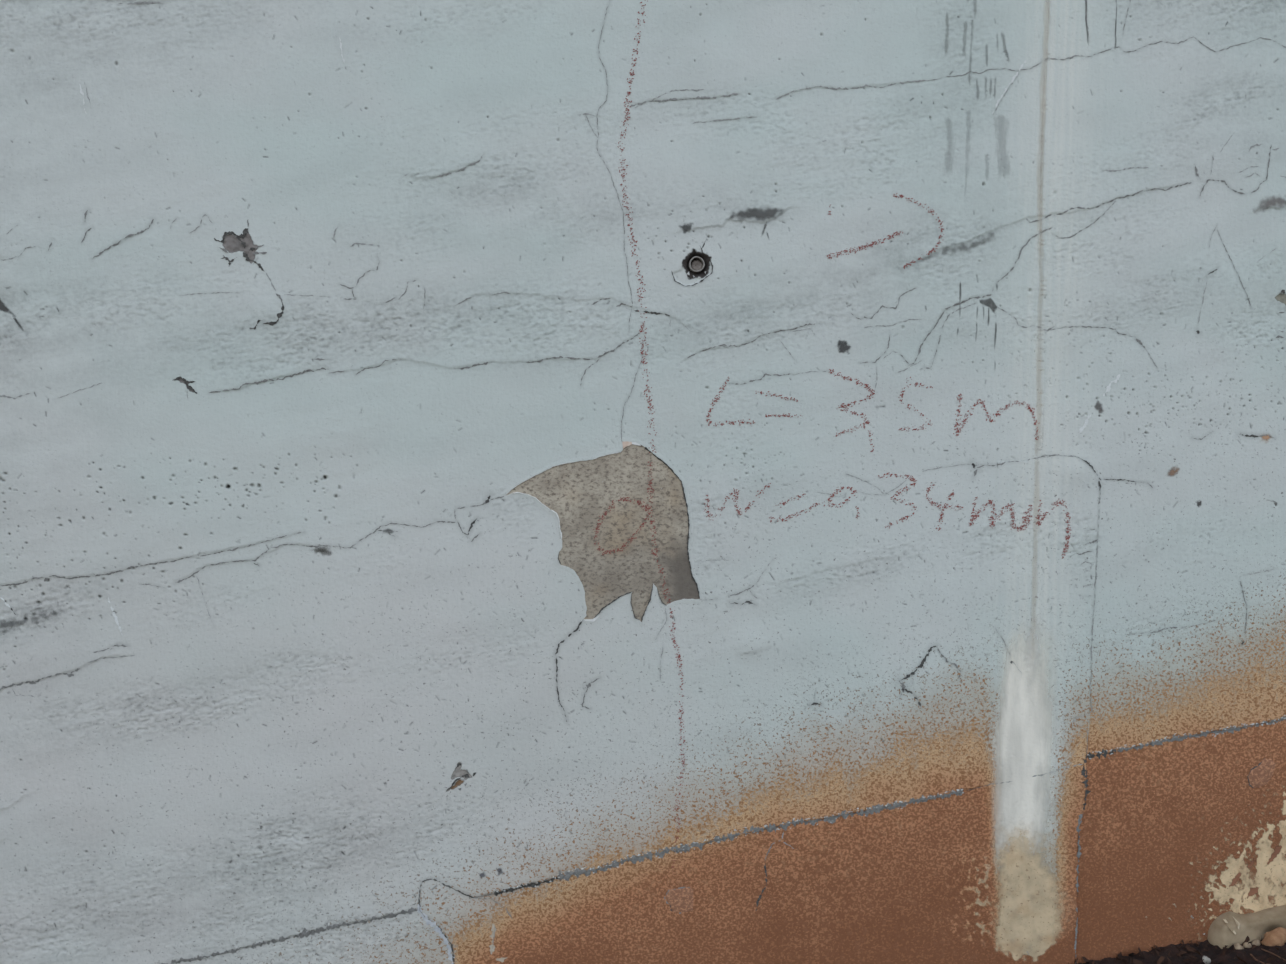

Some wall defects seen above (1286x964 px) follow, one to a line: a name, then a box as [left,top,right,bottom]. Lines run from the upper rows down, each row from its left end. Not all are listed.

crack [777,0,1286,99]
crack [526,7,826,441]
crack [851,132,1284,388]
crack [209,358,396,393]
crack [0,495,504,590]
peeling [500,437,705,627]
crack [0,644,134,697]
crack [161,454,1286,964]
damp [975,643,1061,961]
peeling [1190,791,1286,934]